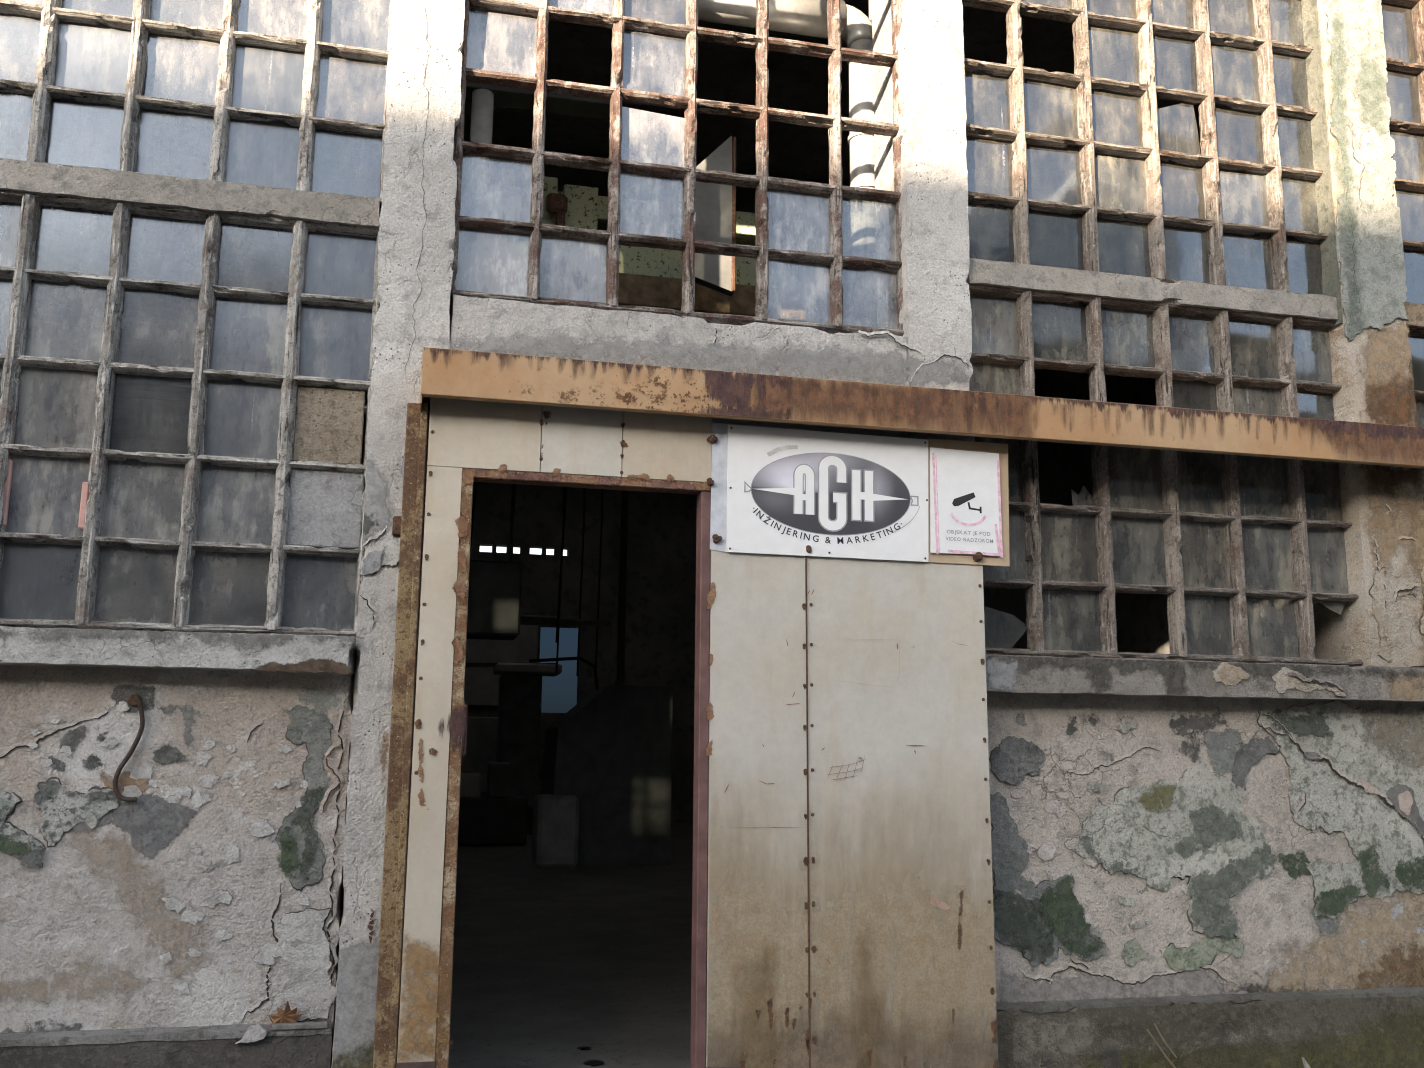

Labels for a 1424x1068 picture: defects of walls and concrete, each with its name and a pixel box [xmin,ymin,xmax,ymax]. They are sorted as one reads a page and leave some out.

water stain [1328,18,1362,333]
rust [424,323,1424,617]
crack [0,705,110,758]
peeling [0,705,246,872]
peeling [248,658,350,906]
crack [319,677,377,1022]
rust [414,703,467,810]
rust [452,637,463,662]
peeling [989,667,1424,1003]
spalling [1212,662,1249,687]
crack [1261,711,1424,843]
crack [238,883,285,1023]